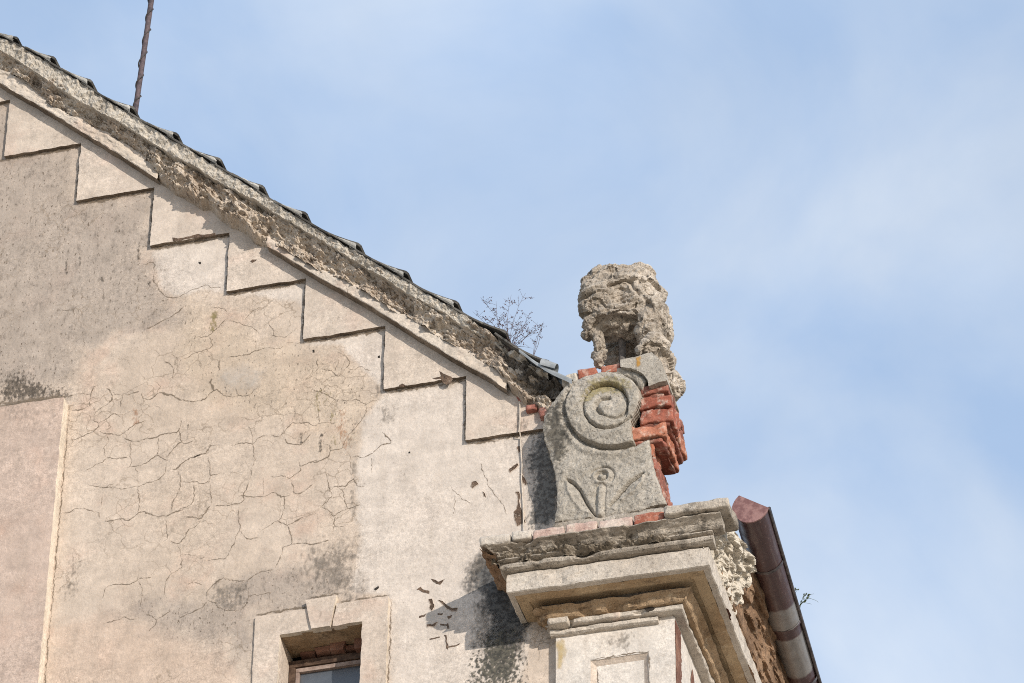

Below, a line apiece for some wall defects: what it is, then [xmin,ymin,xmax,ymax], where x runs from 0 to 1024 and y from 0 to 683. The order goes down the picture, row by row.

spalling [0,50,563,410]
leakage [0,394,71,406]
crack [65,262,391,631]
spalling [417,579,460,649]
leakage [465,555,530,653]
spalling [703,531,789,683]